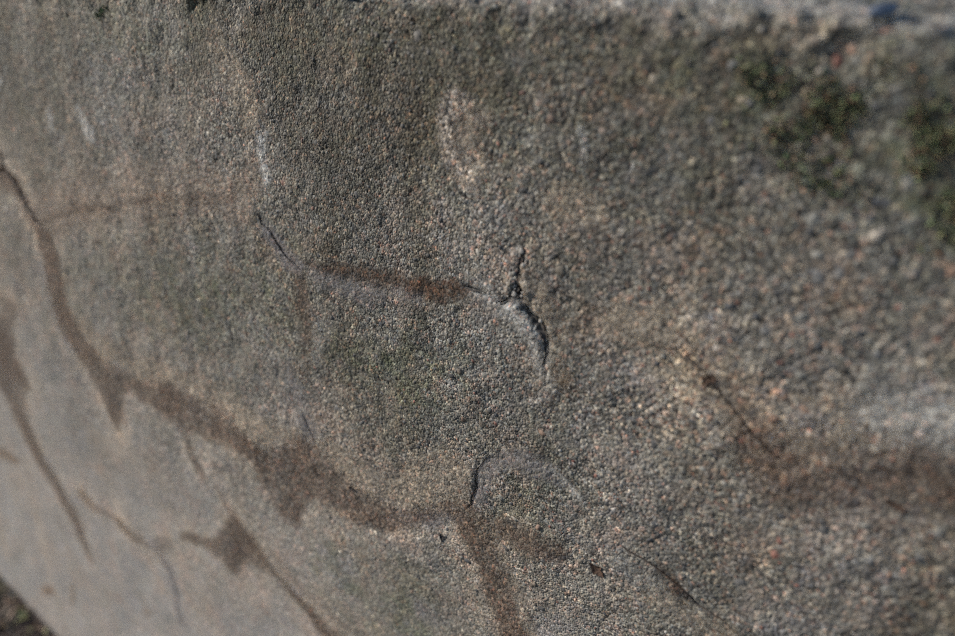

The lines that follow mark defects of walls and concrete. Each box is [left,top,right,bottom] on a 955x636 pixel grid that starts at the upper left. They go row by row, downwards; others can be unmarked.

water stain [228,65,271,186]
water stain [0,172,561,636]
crack [468,455,490,507]
crack [464,247,780,461]